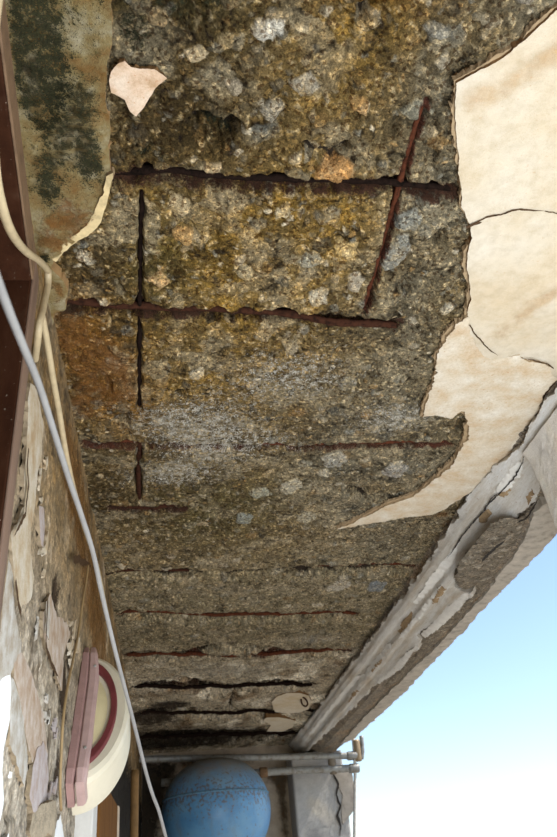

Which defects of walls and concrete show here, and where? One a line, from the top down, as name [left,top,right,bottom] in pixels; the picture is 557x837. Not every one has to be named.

leakage [119,0,160,56]
leakage [6,0,105,241]
corrosion [112,97,459,331]
crack [466,208,557,229]
spalling [52,0,557,736]
crack [469,325,497,355]
corrosion [233,440,453,452]
corrosion [64,427,223,660]
peeling [0,383,58,819]
peeling [34,593,81,691]
spalling [141,708,315,754]
crack [333,774,341,832]